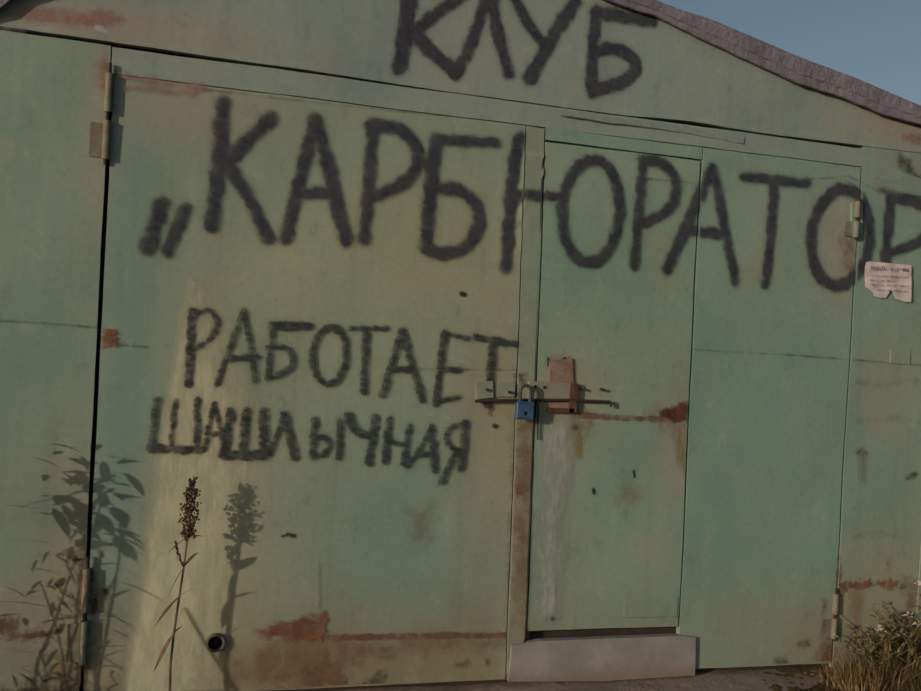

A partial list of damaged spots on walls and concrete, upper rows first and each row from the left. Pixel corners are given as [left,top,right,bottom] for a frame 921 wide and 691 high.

corrosion [570,401,688,457]
corrosion [836,556,916,608]
corrosion [0,616,61,641]
corrosion [256,610,506,643]